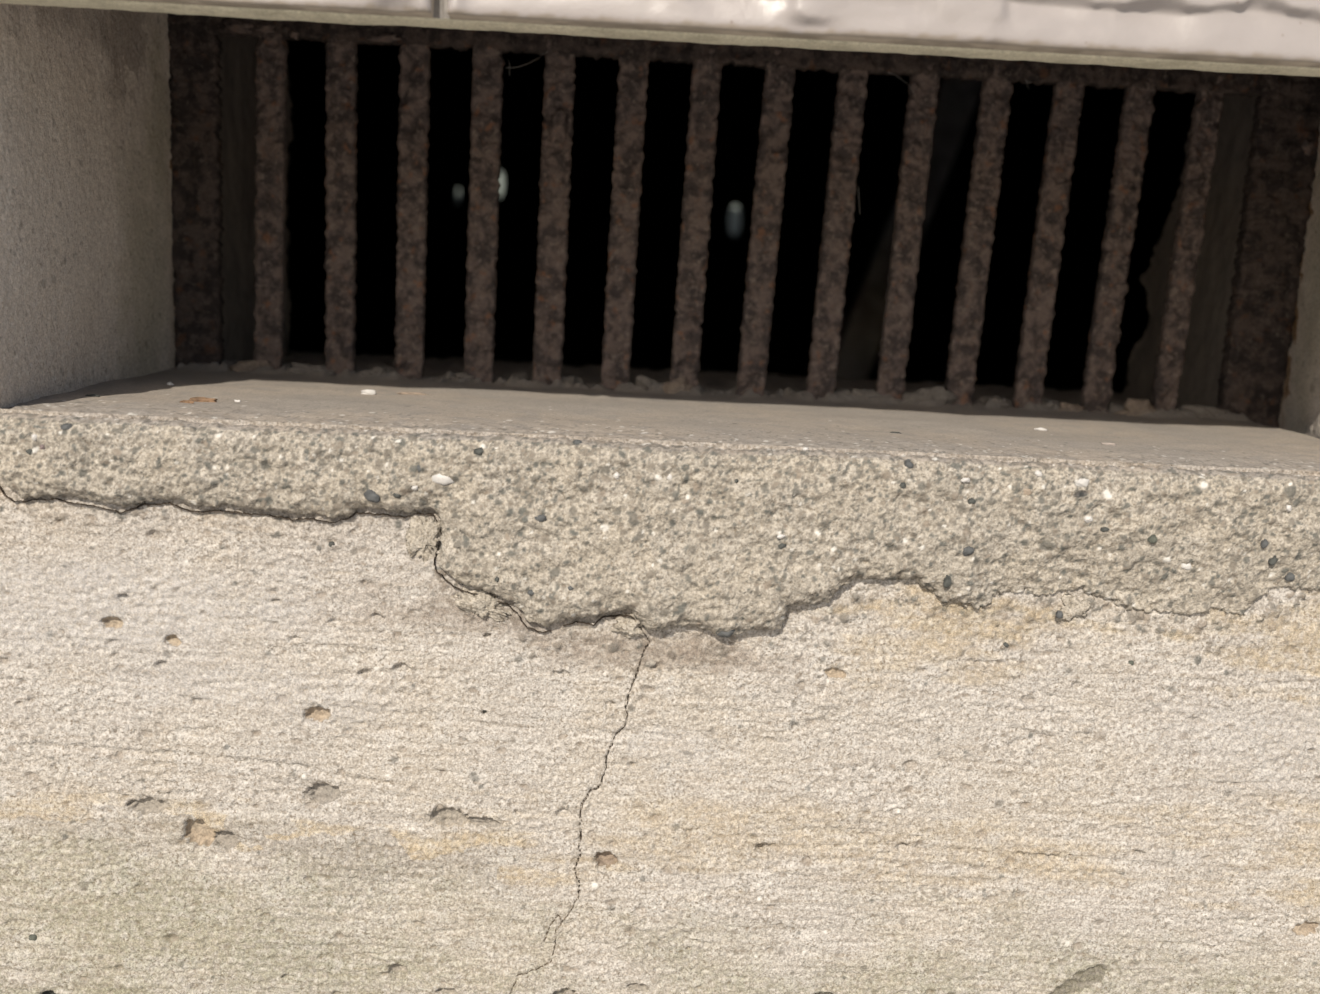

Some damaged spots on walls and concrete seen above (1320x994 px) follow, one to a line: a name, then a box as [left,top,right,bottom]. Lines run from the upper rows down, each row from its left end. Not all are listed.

rust [218,19,300,40]
crack [0,486,650,993]